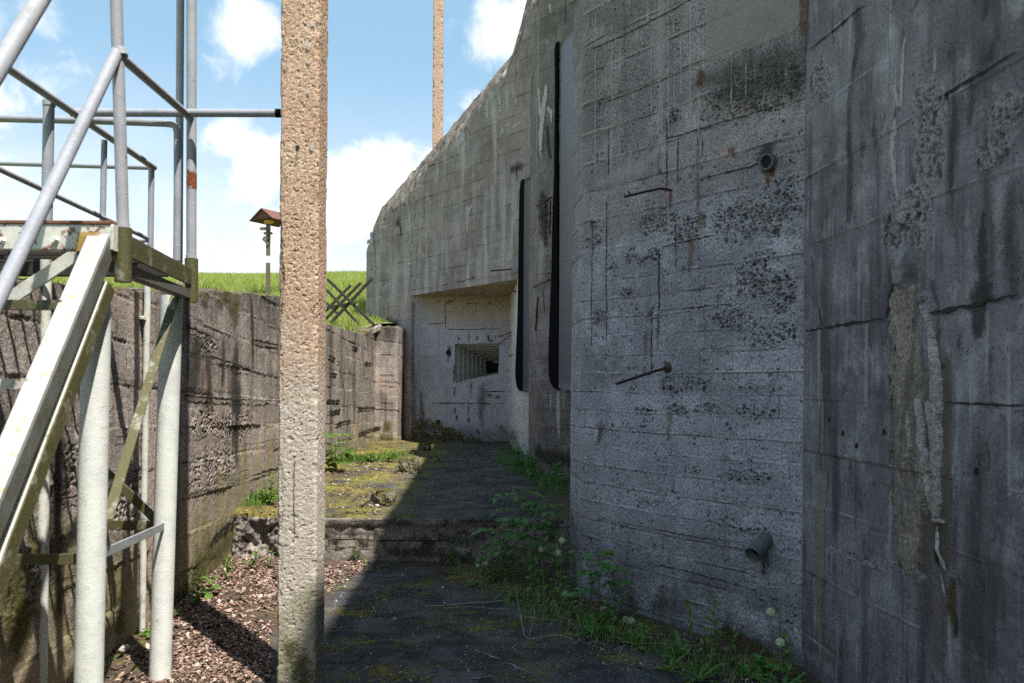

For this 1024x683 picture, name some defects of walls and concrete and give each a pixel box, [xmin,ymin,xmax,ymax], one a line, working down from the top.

crack [942,51,1017,96]
leakage [970,212,991,337]
rust [615,367,667,385]
crack [805,284,1023,410]
peeling [884,284,947,583]